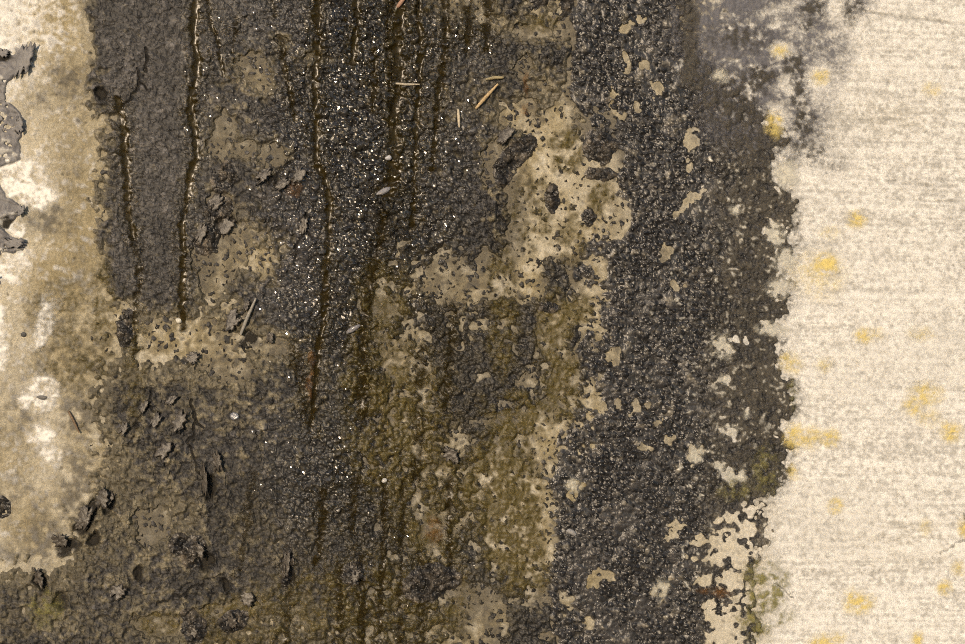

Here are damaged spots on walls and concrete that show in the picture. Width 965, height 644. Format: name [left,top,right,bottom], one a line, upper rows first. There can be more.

peeling [0,185,27,255]
peeling [0,41,35,167]
spalling [94,87,107,100]
water stain [113,96,137,254]
water stain [177,0,238,332]
water stain [277,0,341,426]
water stain [353,211,388,420]
water stain [363,0,451,230]
water stain [462,0,494,53]
water stain [672,0,846,517]
peeling [51,486,116,556]
water stain [398,345,426,542]